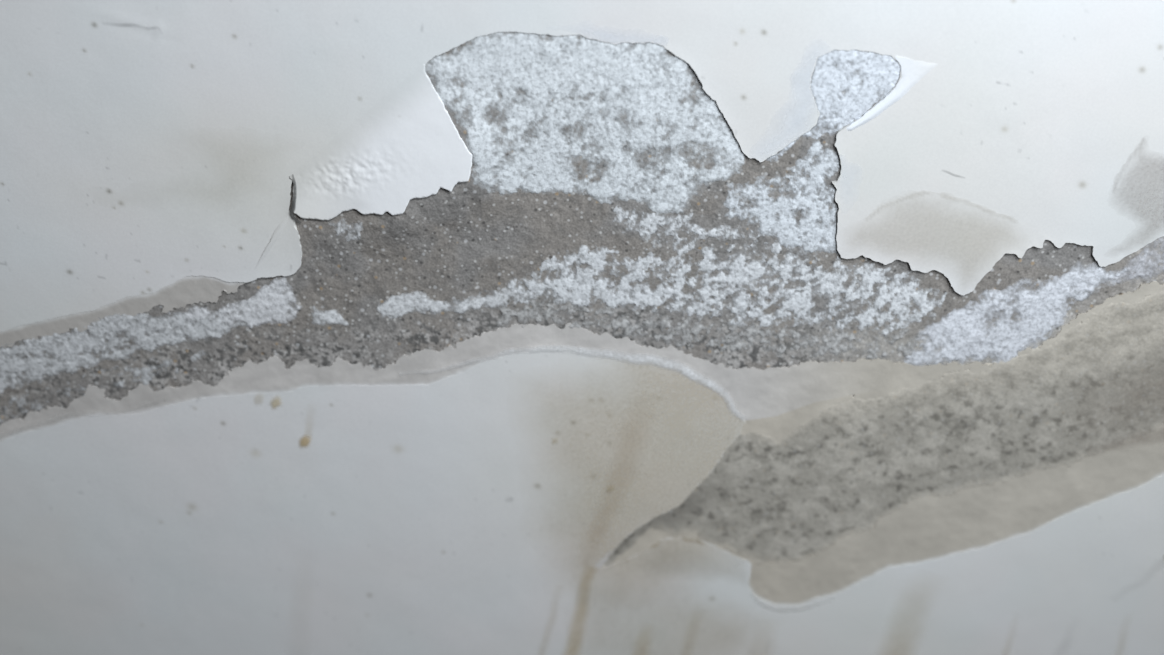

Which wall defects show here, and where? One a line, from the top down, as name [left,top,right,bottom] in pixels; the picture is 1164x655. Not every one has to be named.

peeling [0,32,1164,442]
peeling [593,291,1164,605]